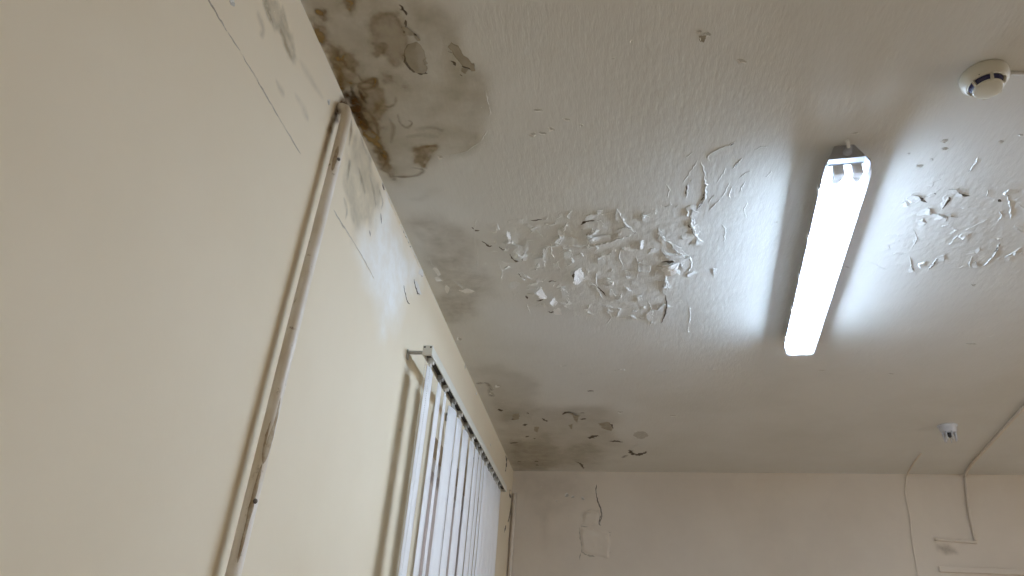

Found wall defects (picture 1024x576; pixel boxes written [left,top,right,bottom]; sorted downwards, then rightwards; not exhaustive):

damp [314,9,325,45]
peeling [472,142,751,333]
peeling [864,139,1024,273]
crack [579,485,611,559]